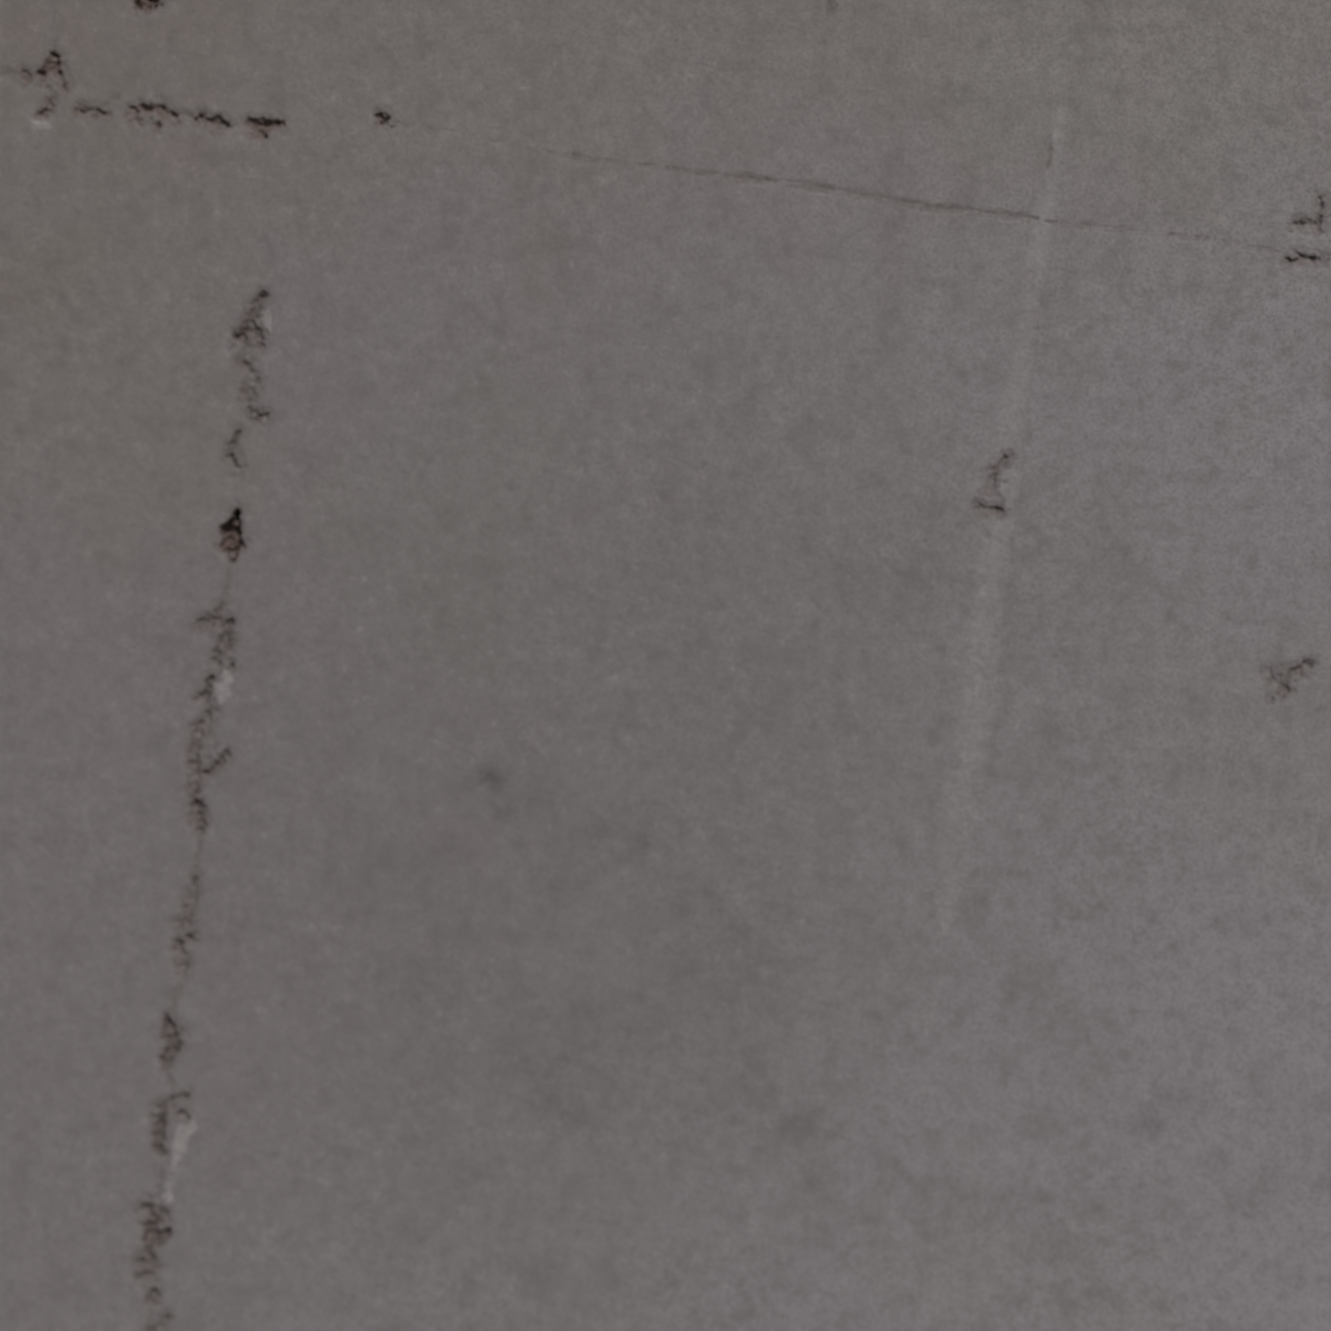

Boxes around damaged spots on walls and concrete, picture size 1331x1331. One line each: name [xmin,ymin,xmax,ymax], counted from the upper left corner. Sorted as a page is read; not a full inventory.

crack [69,93,291,149]
crack [368,104,1282,254]
crack [129,284,278,1331]